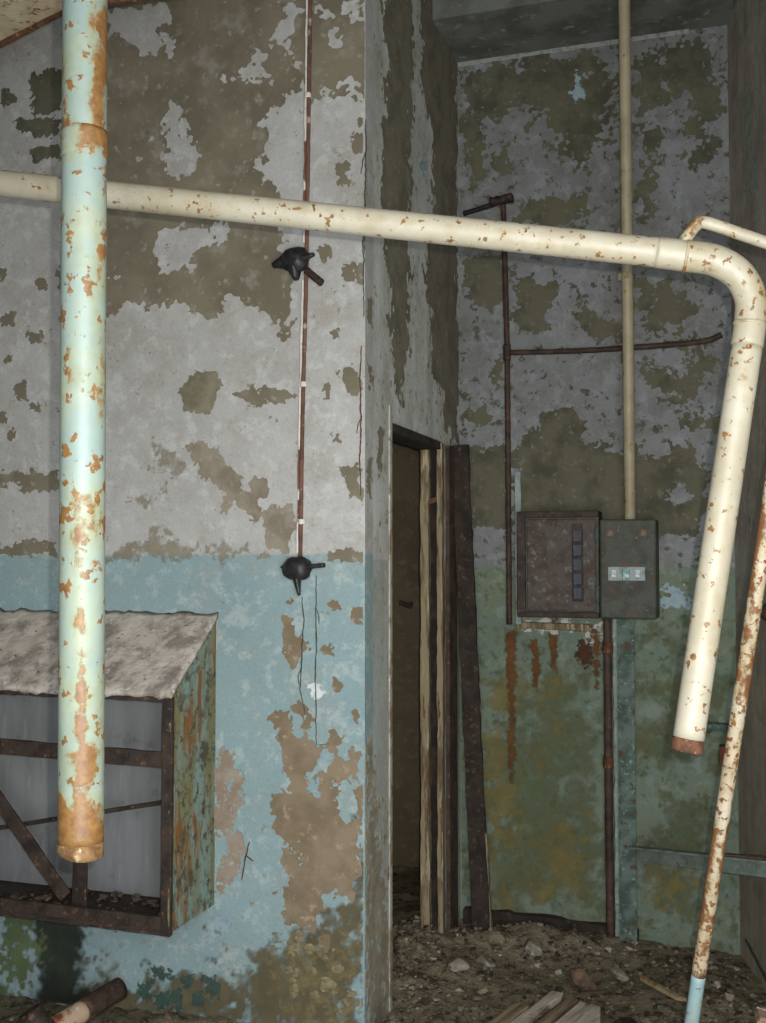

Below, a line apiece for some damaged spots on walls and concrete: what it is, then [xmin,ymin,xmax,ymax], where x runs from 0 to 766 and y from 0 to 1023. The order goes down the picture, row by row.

peeling [12,67,62,164]
peeling [106,208,298,342]
peeling [107,0,365,198]
peeling [377,0,620,216]
peeling [509,190,591,227]
peeling [631,35,727,224]
peeling [177,369,298,415]
peeling [383,238,721,540]
peeling [185,439,297,554]
corrosion [505,618,559,783]
corrosion [575,625,601,689]
peeling [266,700,389,1023]